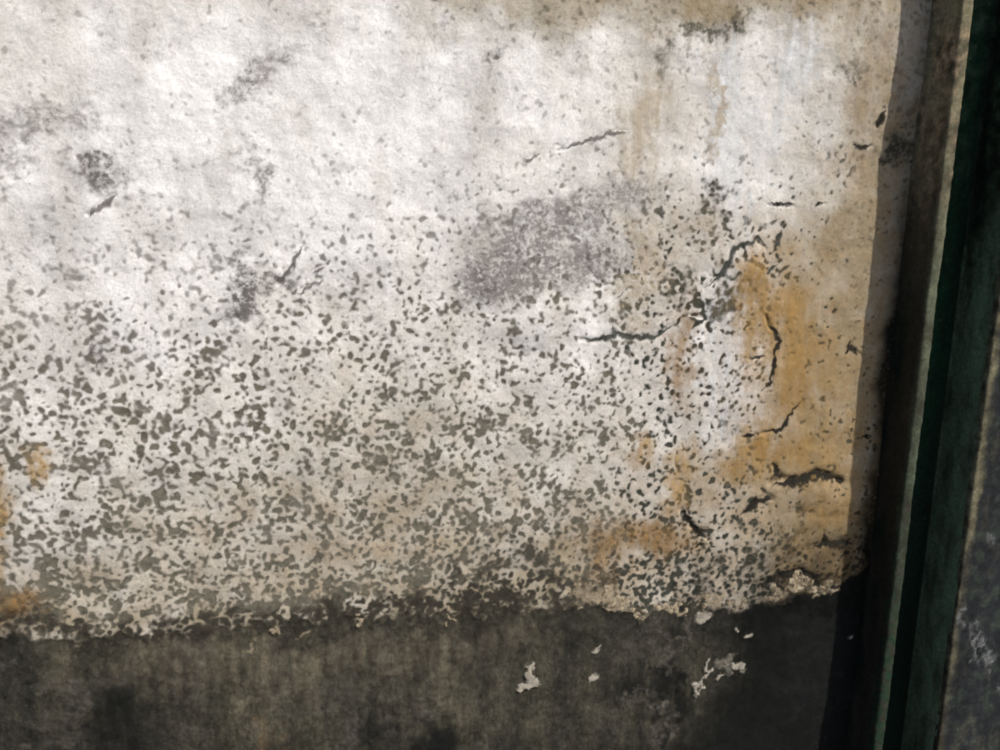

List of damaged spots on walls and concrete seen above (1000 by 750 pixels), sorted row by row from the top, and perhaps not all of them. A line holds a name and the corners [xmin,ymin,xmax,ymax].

crack [524,130,629,161]
crack [580,316,709,341]
crack [750,318,782,387]
peeling [0,186,877,640]
crack [744,401,802,437]
crack [741,465,844,515]
leakage [12,552,606,645]
leakage [681,500,870,750]
leakage [412,726,458,750]